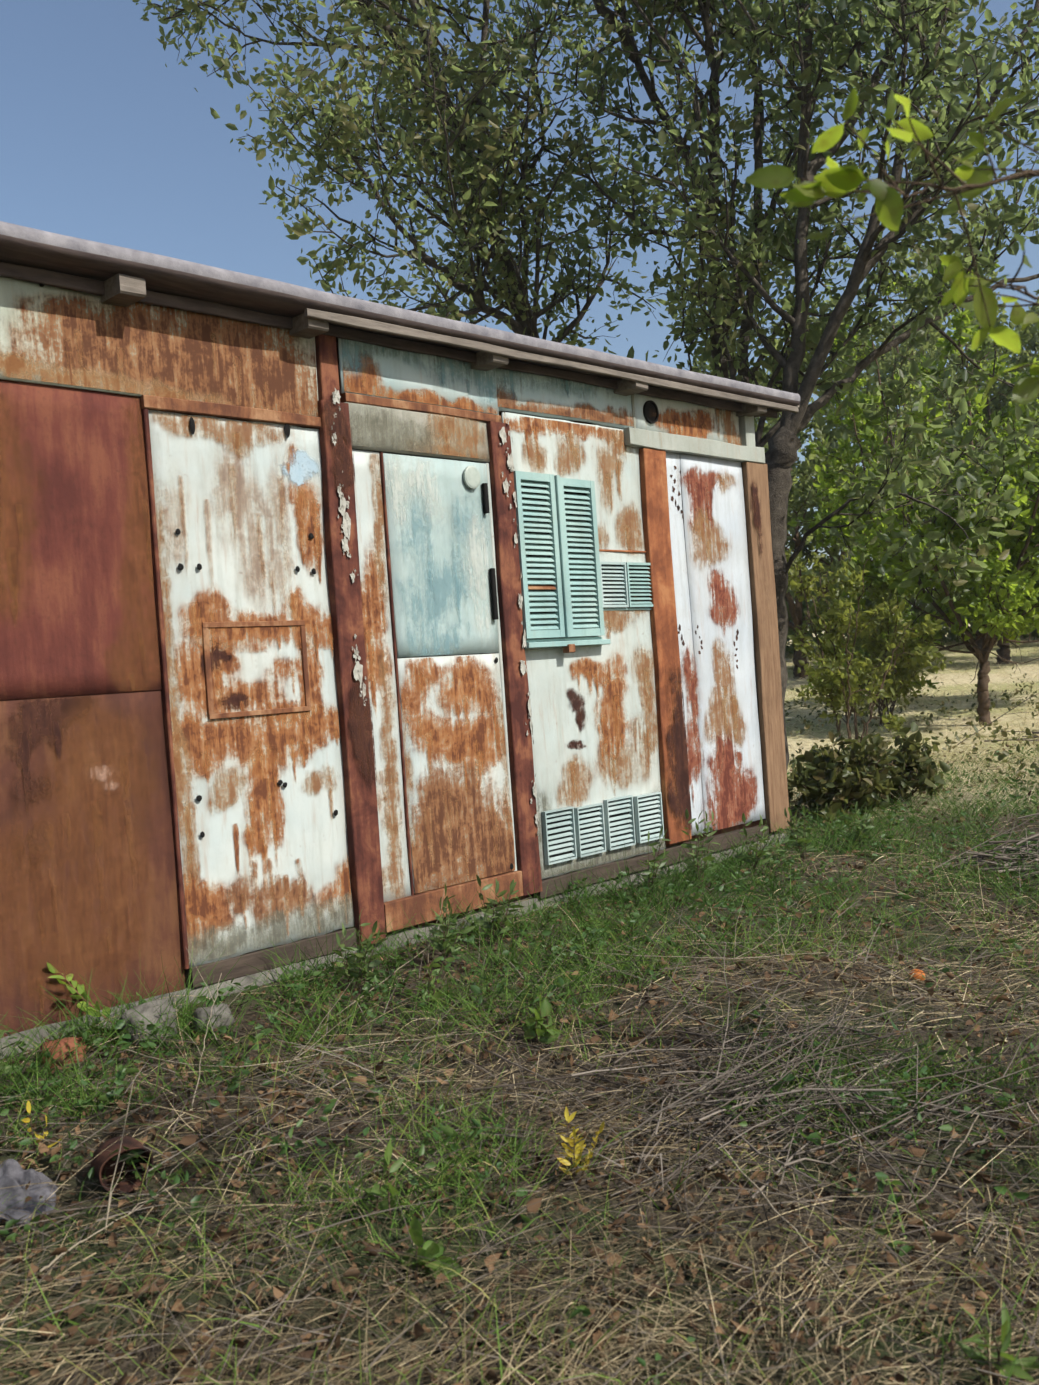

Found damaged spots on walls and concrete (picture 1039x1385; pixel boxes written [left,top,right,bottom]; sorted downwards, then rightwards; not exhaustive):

rust [0,295,645,956]
rust [558,467,758,834]
rust [655,408,741,445]
rust [751,482,763,556]